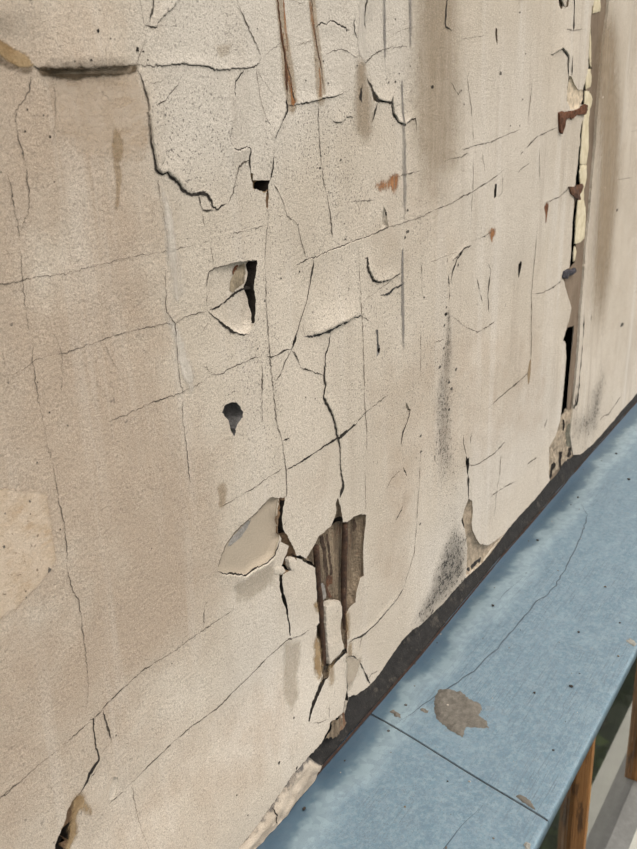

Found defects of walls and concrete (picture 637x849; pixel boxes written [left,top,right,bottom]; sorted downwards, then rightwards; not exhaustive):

crack [550,0,581,76]
spalling [205,260,265,336]
crack [531,239,561,354]
crack [0,0,518,737]
crack [573,316,592,409]
hole [222,402,243,436]
flaking render [549,408,573,478]
spalling [217,497,279,574]
spalling [302,498,366,679]
crack [70,609,234,796]
hole [55,796,77,849]
crack [109,745,171,848]